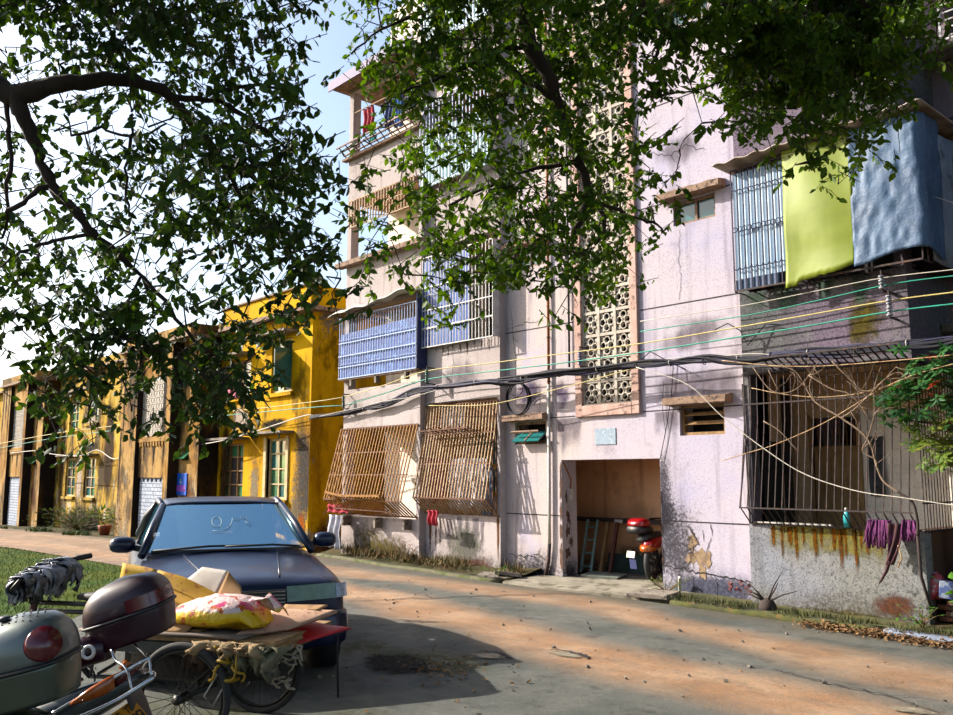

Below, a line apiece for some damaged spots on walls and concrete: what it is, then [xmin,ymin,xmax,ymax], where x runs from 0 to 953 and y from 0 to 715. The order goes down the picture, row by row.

water stain [621,455,751,598]
peeling [685,533,712,580]
corrosion [771,526,882,567]